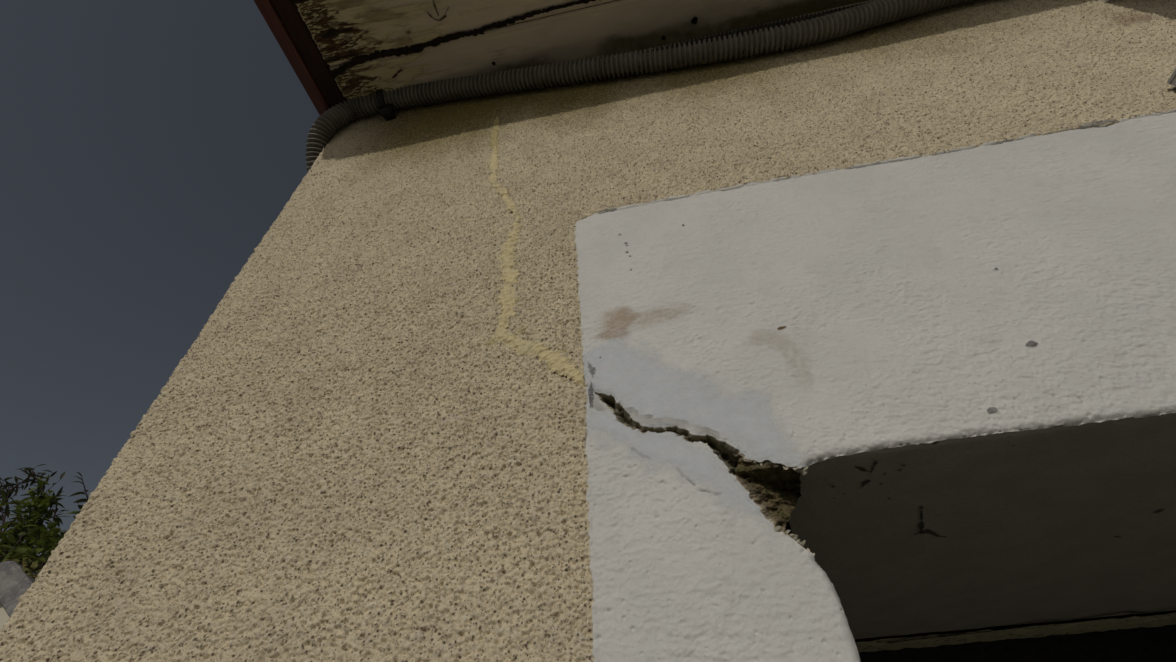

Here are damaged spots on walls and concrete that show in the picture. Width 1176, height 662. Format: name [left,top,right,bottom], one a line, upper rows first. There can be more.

damp [298,0,391,63]
damp [605,0,869,57]
crack [485,116,740,474]